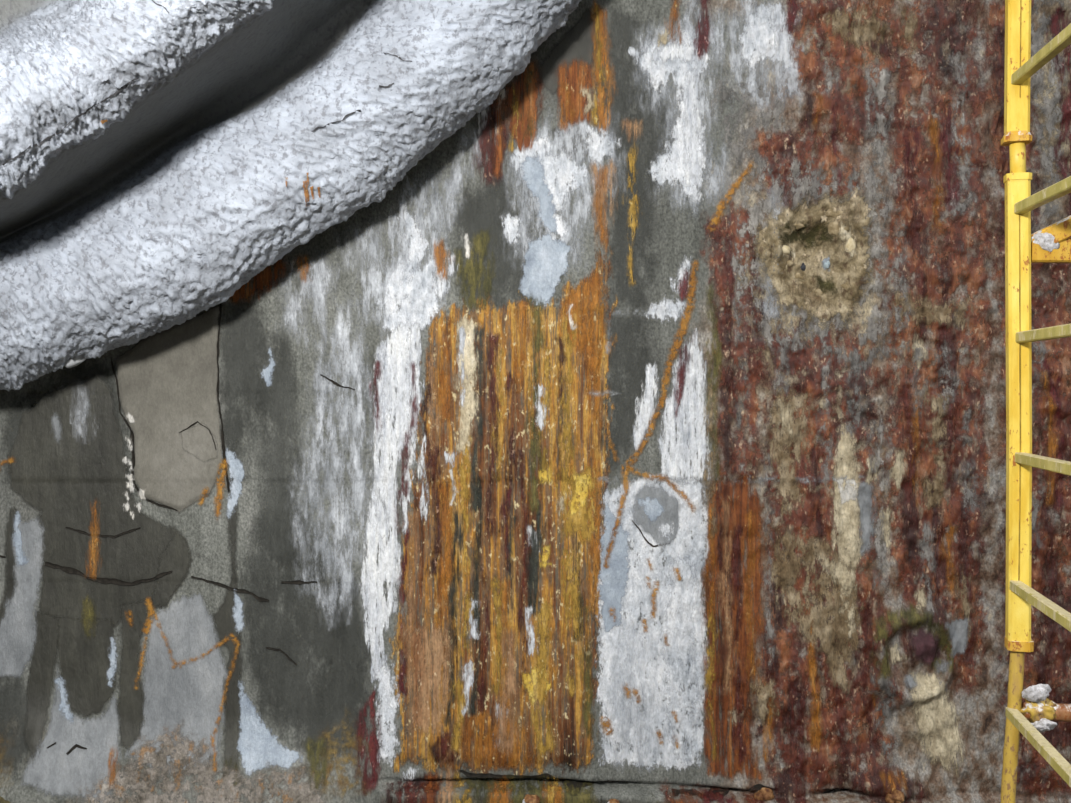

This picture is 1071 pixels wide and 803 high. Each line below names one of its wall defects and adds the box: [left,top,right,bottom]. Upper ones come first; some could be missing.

crack [111,357,178,511]
crack [45,562,317,602]
crack [179,303,229,492]
damp [0,164,461,803]
damp [596,328,711,771]
corrosion [306,0,1010,803]
damp [454,0,971,519]
spalling [755,187,872,330]
damp [771,383,905,692]
corrosion [1022,605,1071,704]
corrosion [1031,263,1071,613]
corrosion [1041,721,1071,763]